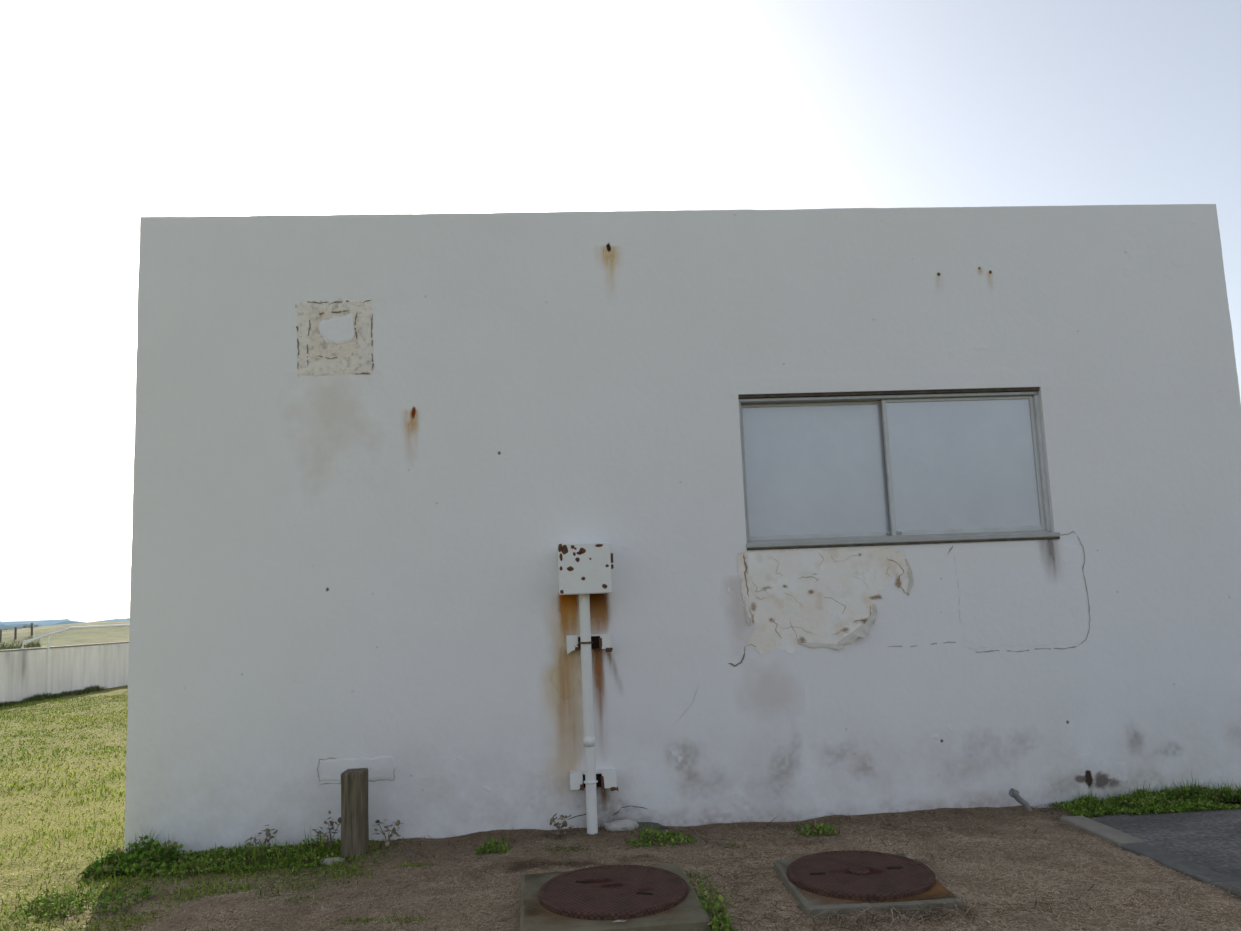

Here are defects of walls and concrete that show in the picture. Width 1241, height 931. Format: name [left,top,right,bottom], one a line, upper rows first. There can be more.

corrosion [560,593,607,625]
peeling [737,546,913,655]
corrosion [594,648,610,704]